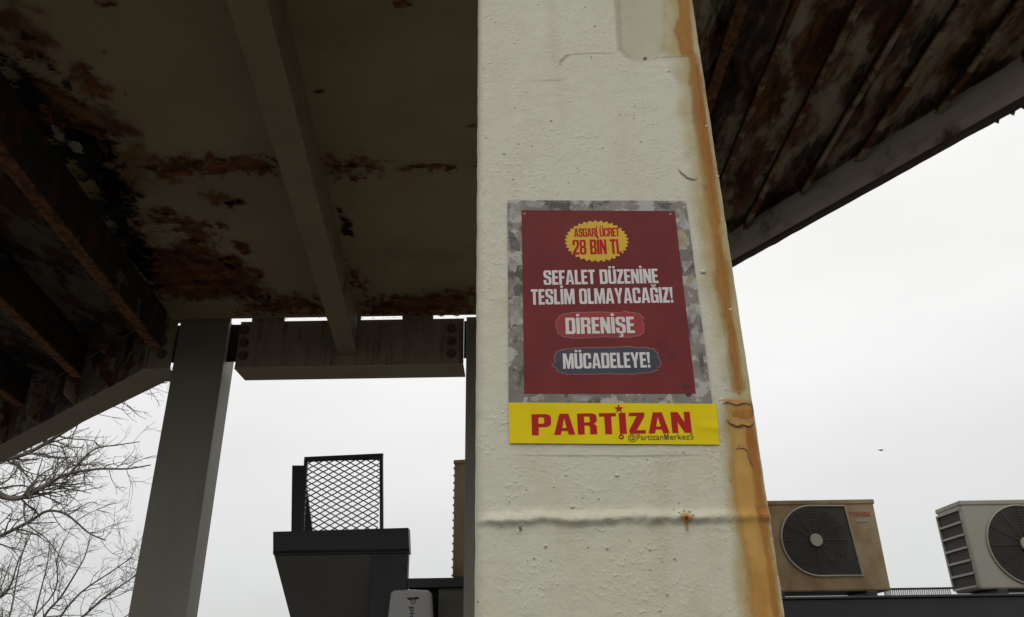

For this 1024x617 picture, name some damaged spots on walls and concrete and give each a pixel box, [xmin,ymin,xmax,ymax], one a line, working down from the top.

rust [90,140,279,205]
rust [321,148,477,183]
rust [118,207,325,320]
rust [344,259,477,319]
rust [671,0,782,617]
peeling [723,399,754,428]